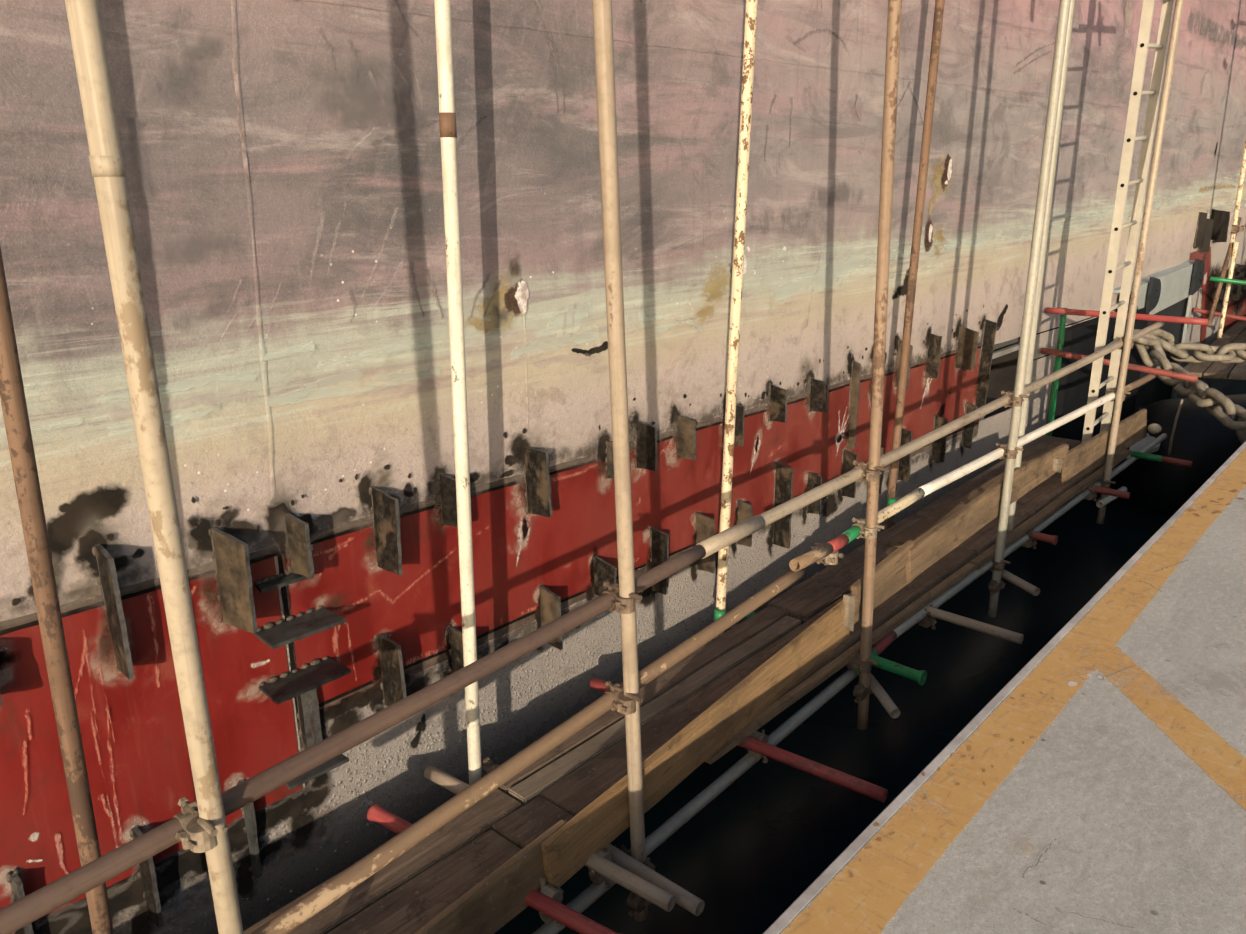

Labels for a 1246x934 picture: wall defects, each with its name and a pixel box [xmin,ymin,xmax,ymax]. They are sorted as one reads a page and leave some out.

corrosion [925,154,952,254]
corrosion [467,260,529,332]